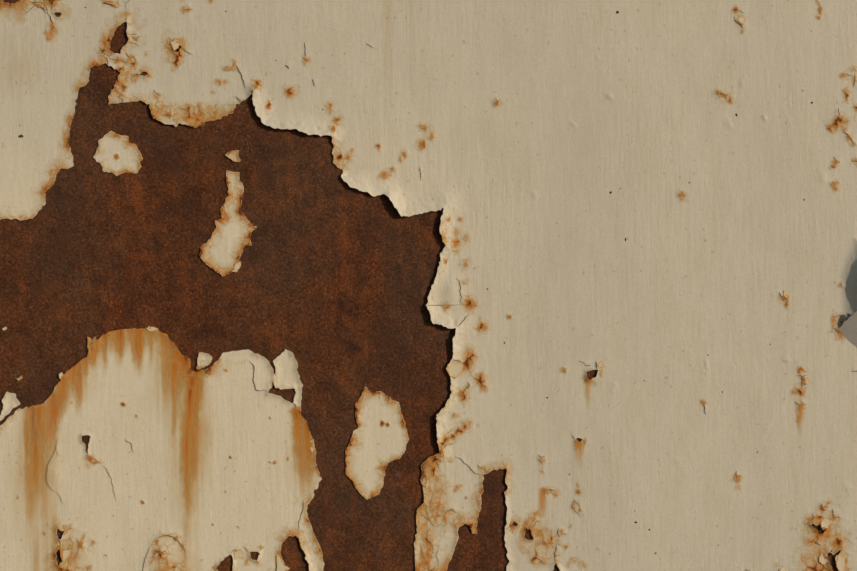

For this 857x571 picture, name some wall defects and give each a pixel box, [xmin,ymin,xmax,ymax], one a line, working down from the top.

peeling [0,0,56,17]
rust [154,91,218,124]
rust [827,69,857,132]
peeling [0,14,565,571]
peeling [832,237,857,347]
rust [25,328,202,502]
rust [287,407,312,476]
peeling [584,361,605,387]
rust [792,367,809,422]